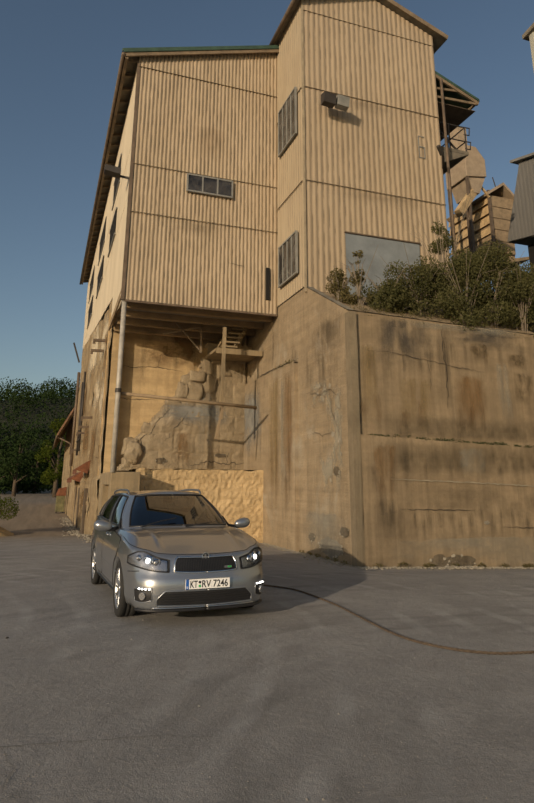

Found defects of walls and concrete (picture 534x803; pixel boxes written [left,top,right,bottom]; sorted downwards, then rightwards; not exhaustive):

crack [369,331,478,405]